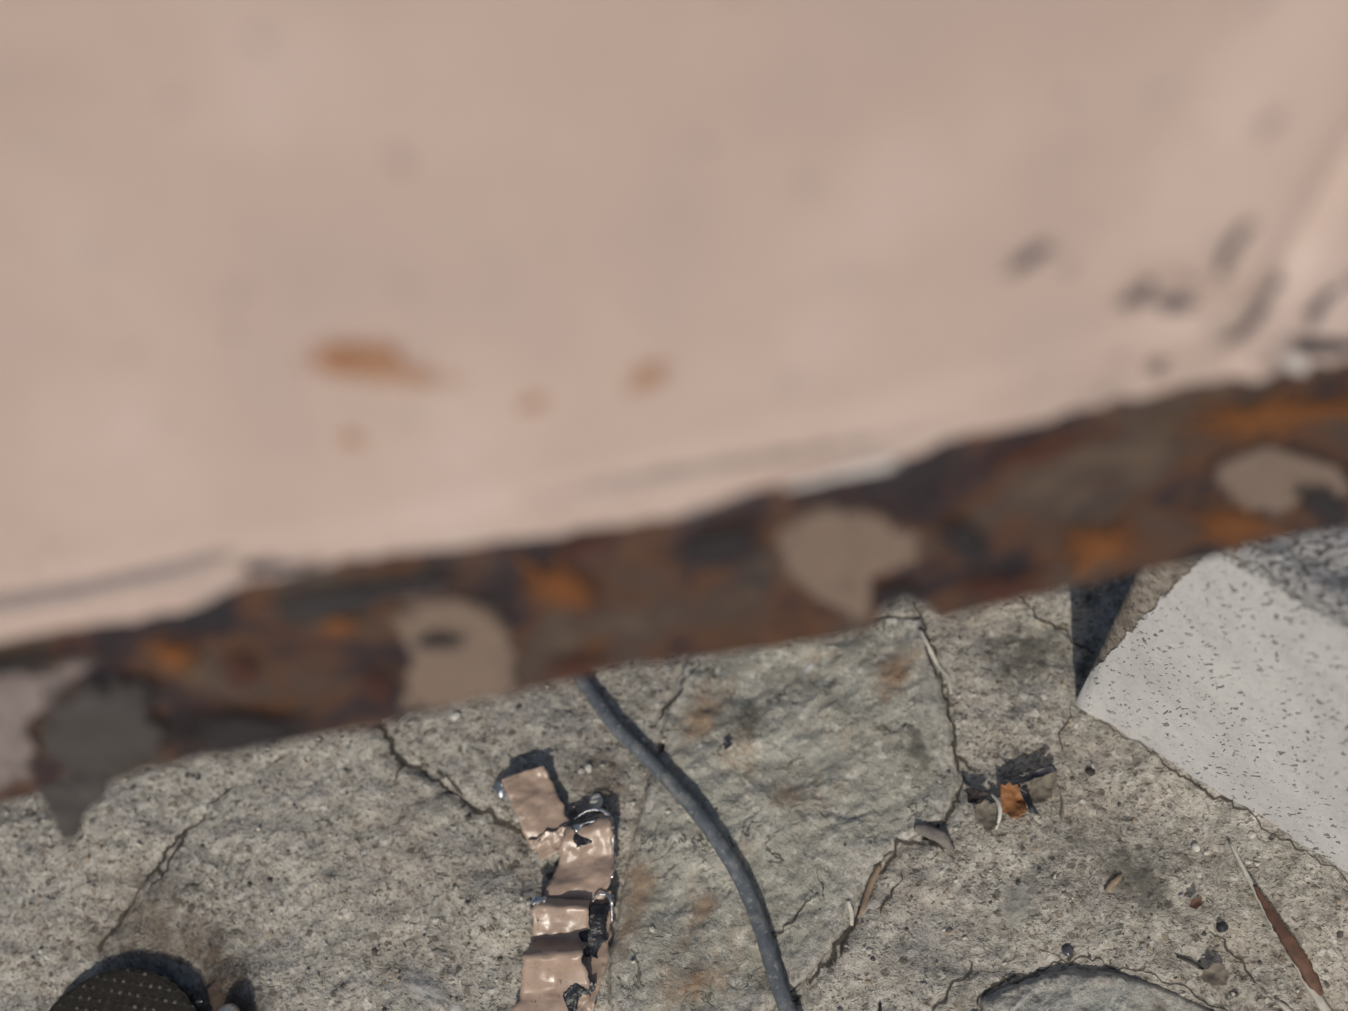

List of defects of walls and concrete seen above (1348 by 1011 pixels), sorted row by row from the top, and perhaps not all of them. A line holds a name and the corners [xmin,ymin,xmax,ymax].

corrosion [322,345,430,381]
peeling [1277,337,1348,374]
corrosion [520,537,614,611]
corrosion [966,579,1034,601]
crack [659,659,701,720]
crack [378,726,527,840]
crack [793,605,976,1002]
crack [755,898,812,943]